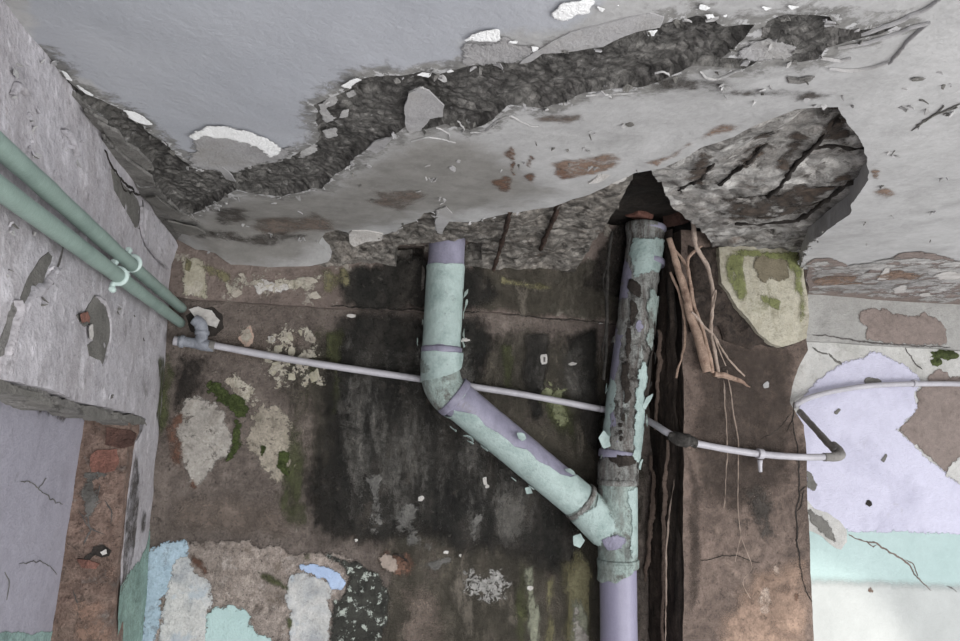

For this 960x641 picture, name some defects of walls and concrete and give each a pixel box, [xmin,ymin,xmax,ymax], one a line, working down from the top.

spalling [254,166,638,382]
flaking render [13,0,899,299]
corrosion [492,148,535,192]
corrosion [555,155,616,180]
leakage [734,249,805,319]
spalling [651,95,960,350]
leakage [167,357,232,489]
leakage [224,248,600,641]
leakage [460,221,628,489]
peeling [900,369,960,472]
peeling [186,539,353,641]
crack [849,534,956,591]